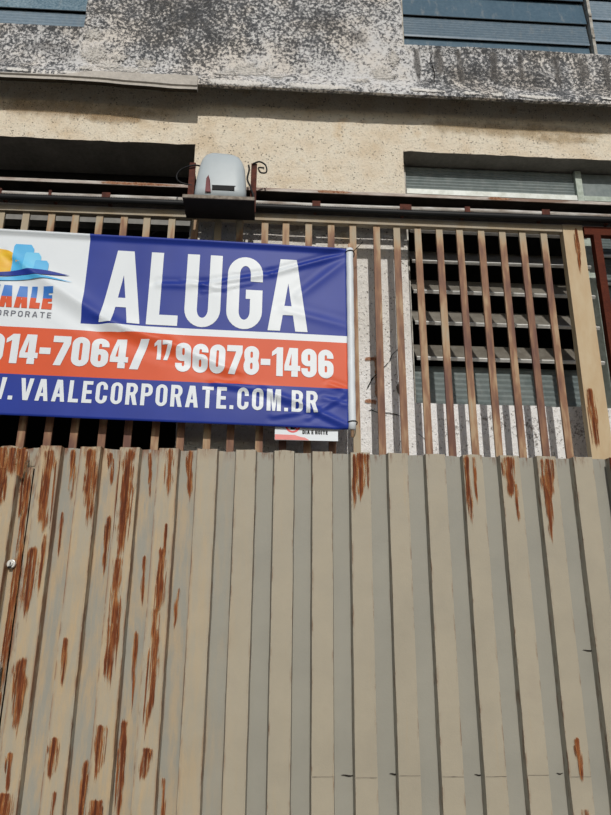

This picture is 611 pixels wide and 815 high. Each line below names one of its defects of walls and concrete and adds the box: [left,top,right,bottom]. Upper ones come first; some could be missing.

water stain [207,78,271,86]
water stain [290,82,351,90]
water stain [457,51,479,95]
water stain [490,52,503,96]
water stain [578,59,589,81]
water stain [602,58,611,100]
rust [352,453,370,505]
rust [540,459,554,541]
rust [0,447,64,736]
rust [102,448,135,686]
rust [138,523,167,779]
rust [78,724,108,815]